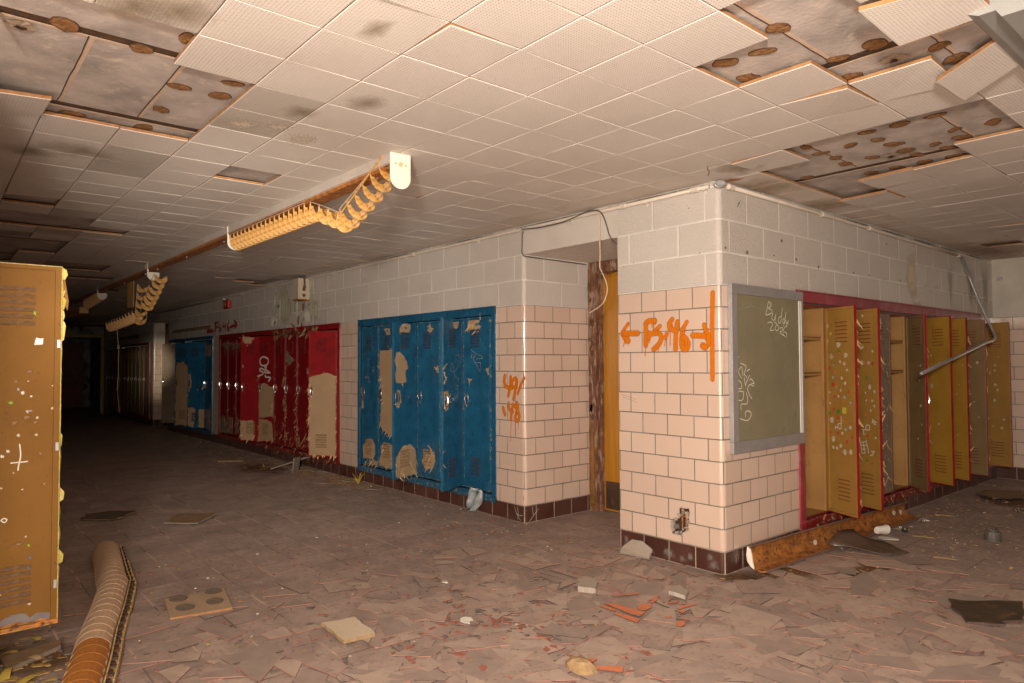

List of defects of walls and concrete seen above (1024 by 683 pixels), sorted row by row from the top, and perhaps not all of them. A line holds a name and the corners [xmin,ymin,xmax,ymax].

peeling [0,0,252,138]
peeling [699,0,992,90]
peeling [216,165,280,182]
peeling [765,98,1022,198]
spalling [670,508,690,535]